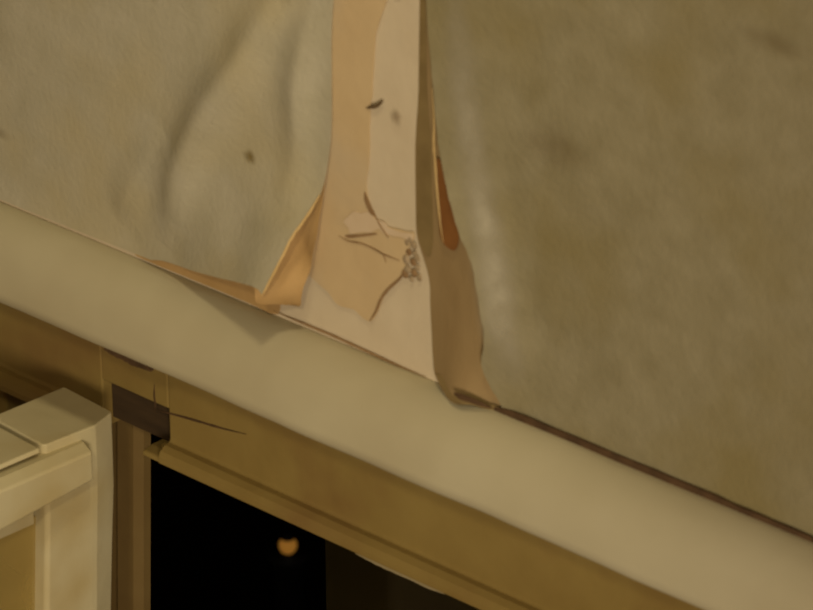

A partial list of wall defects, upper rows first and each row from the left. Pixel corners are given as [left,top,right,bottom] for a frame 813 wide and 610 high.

peeling [308,0,422,322]